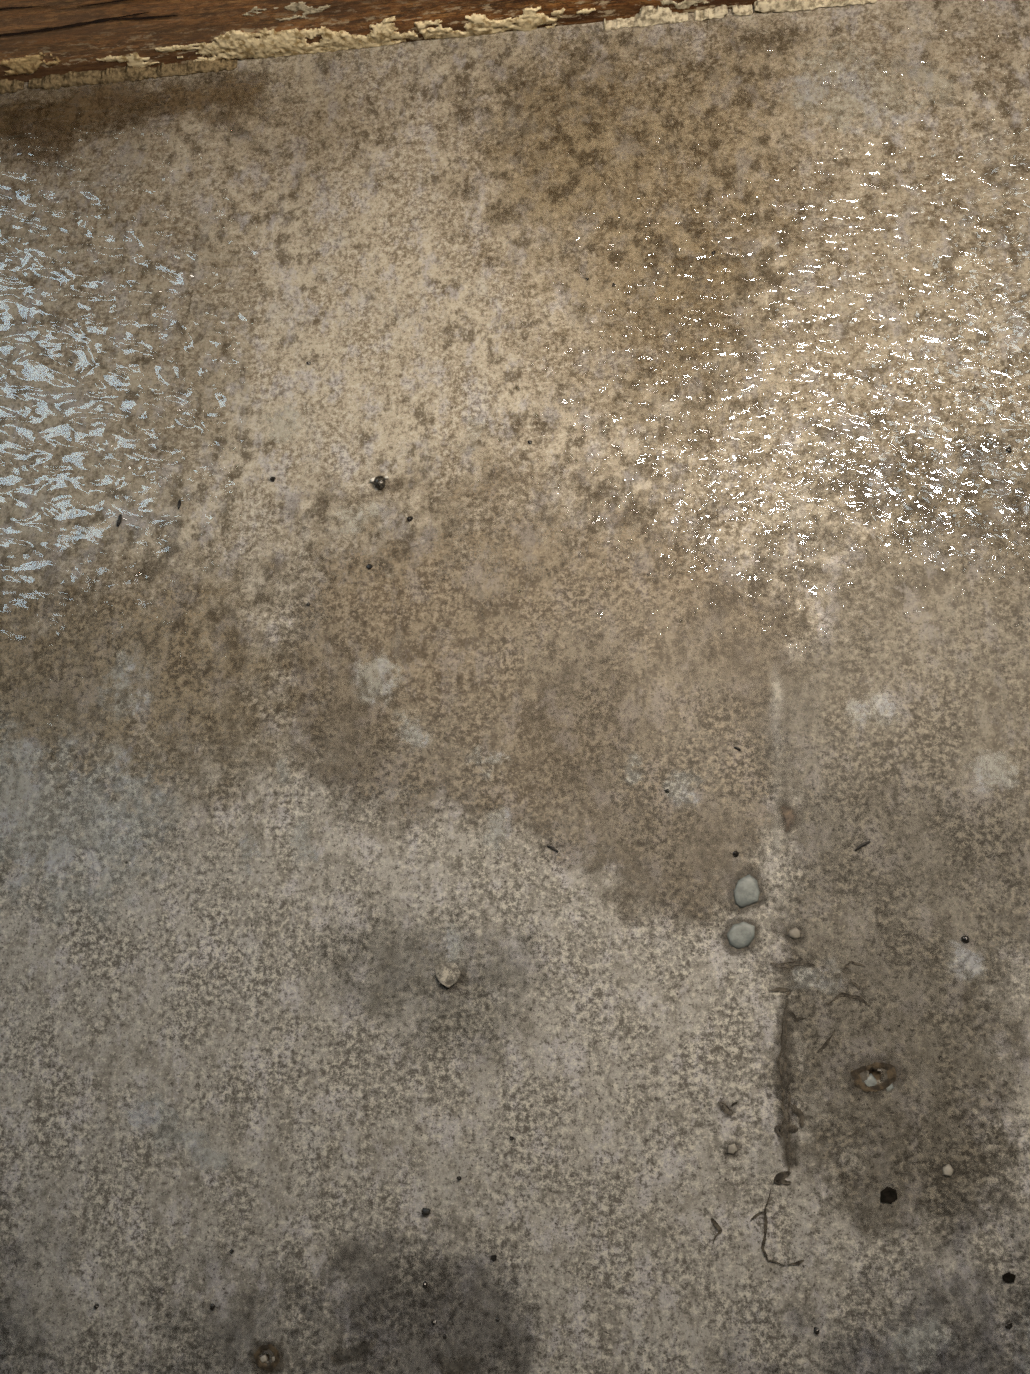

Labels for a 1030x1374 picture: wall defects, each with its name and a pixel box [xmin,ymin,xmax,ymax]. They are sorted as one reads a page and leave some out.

peeling [0,52,62,76]
peeling [96,1,596,68]
peeling [647,0,713,9]
damp [0,71,264,160]
damp [0,435,1030,1232]
crack [711,959,869,1266]
damp [331,1251,531,1374]